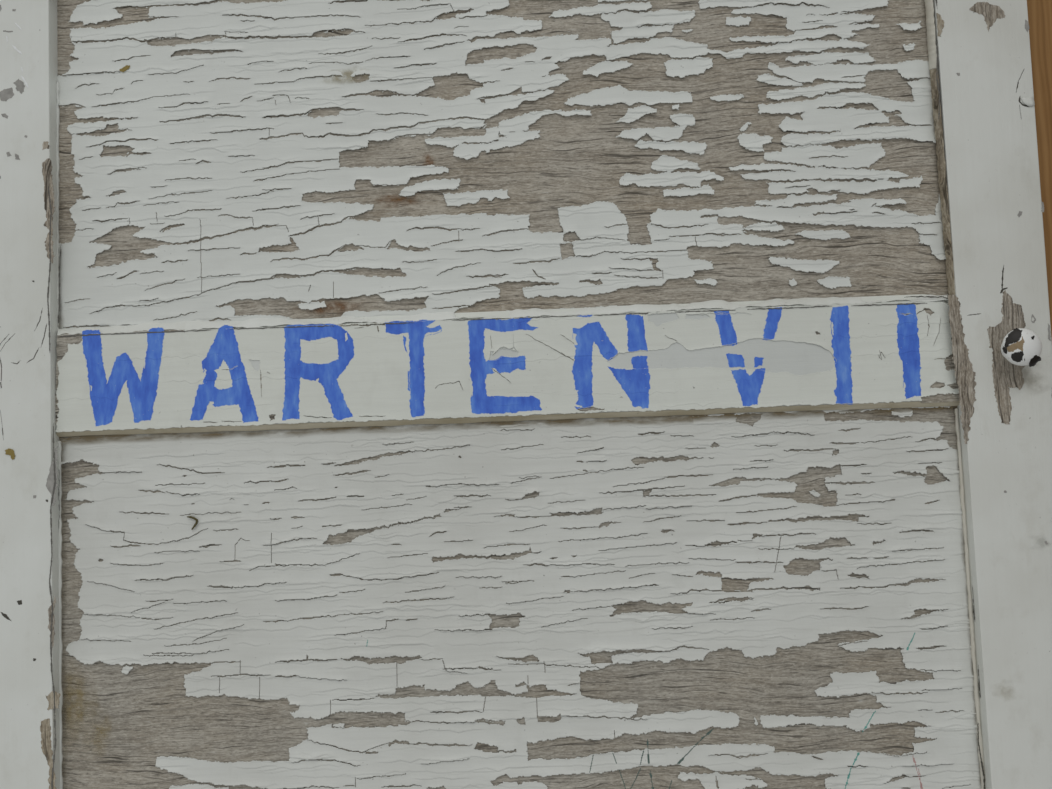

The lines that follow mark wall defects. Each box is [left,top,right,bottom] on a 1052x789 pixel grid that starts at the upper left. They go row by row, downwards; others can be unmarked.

spalling [969,2,1005,31]
peeling [42,0,976,450]
peeling [987,290,1036,424]
peeling [631,442,719,465]
peeling [33,446,961,789]